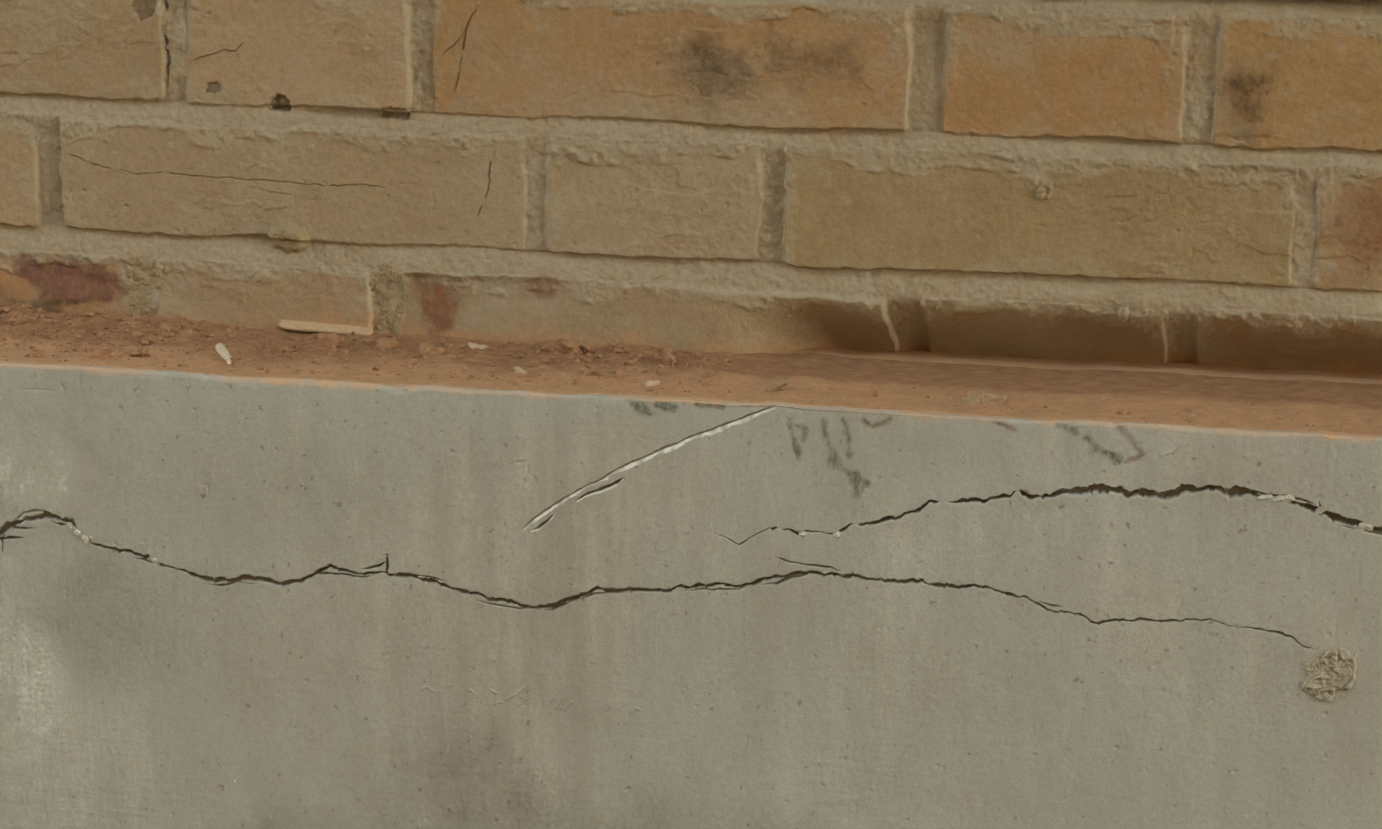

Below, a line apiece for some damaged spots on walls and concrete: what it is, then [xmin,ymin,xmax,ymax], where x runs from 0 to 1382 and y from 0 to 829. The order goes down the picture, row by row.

crack [521,406,779,536]
crack [0,478,1382,655]
spalling [1301,646,1357,702]